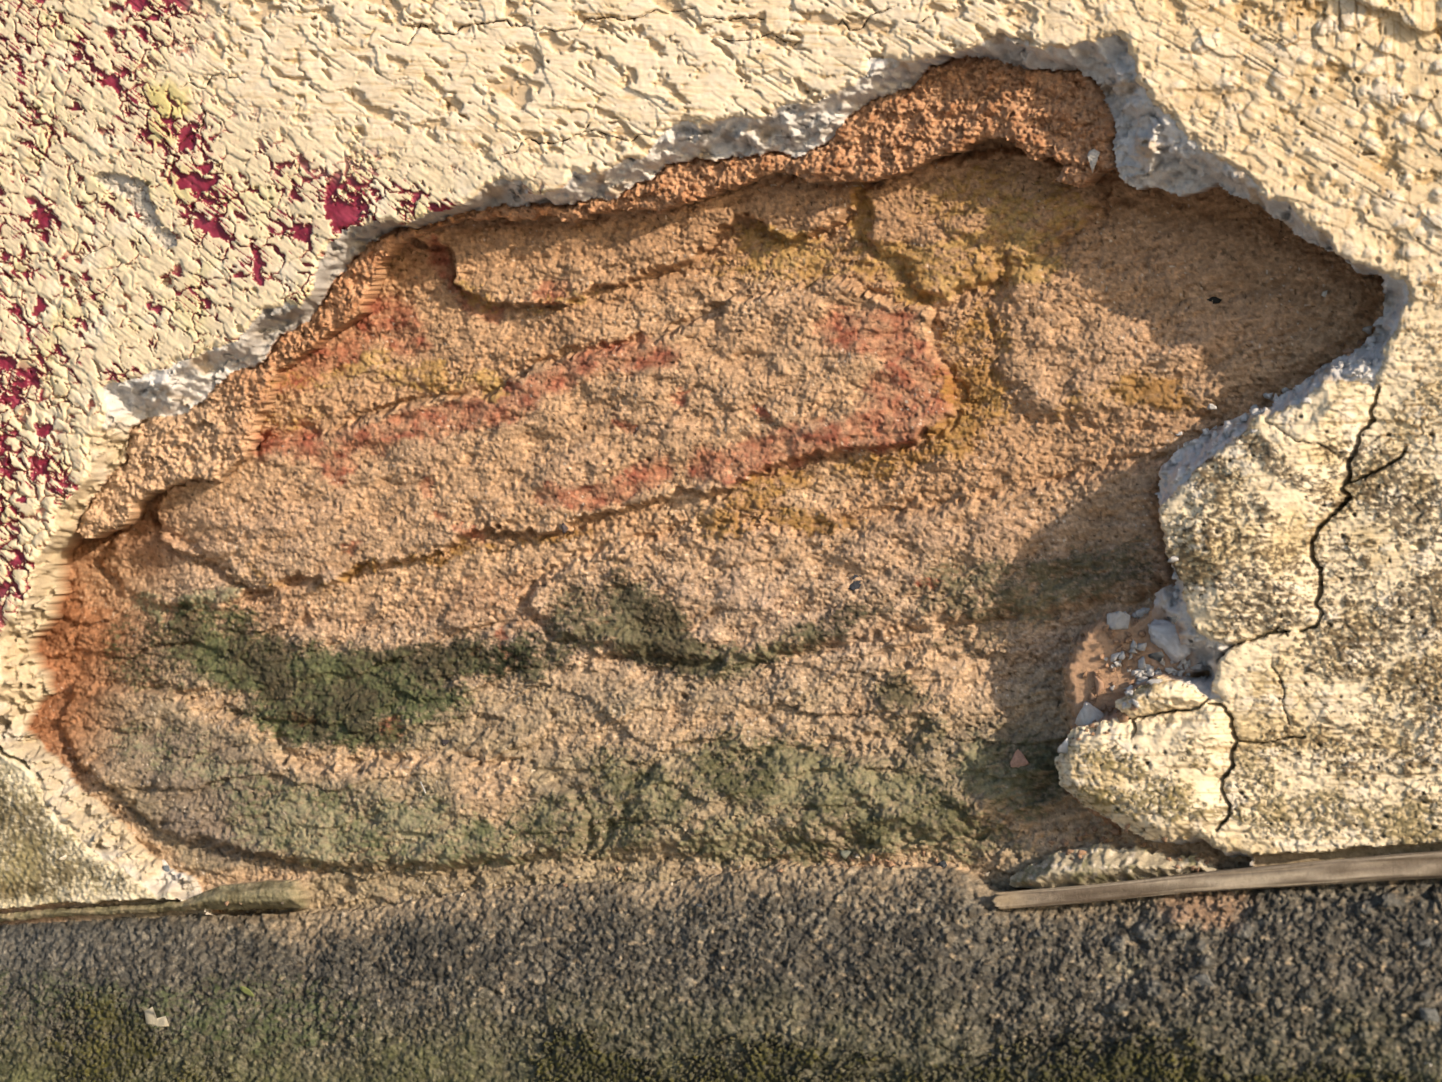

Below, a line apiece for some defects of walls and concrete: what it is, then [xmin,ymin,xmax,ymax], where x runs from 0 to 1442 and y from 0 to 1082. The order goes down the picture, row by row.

peeling [59,0,264,252]
peeling [19,191,61,244]
peeling [269,159,293,176]
peeling [268,209,313,257]
peeling [288,179,302,203]
peeling [229,243,266,285]
peeling [0,244,79,409]
peeling [56,263,105,337]
peeling [172,261,219,321]
peeling [34,423,53,438]
peeling [0,494,26,539]
crack [1223,627,1308,743]